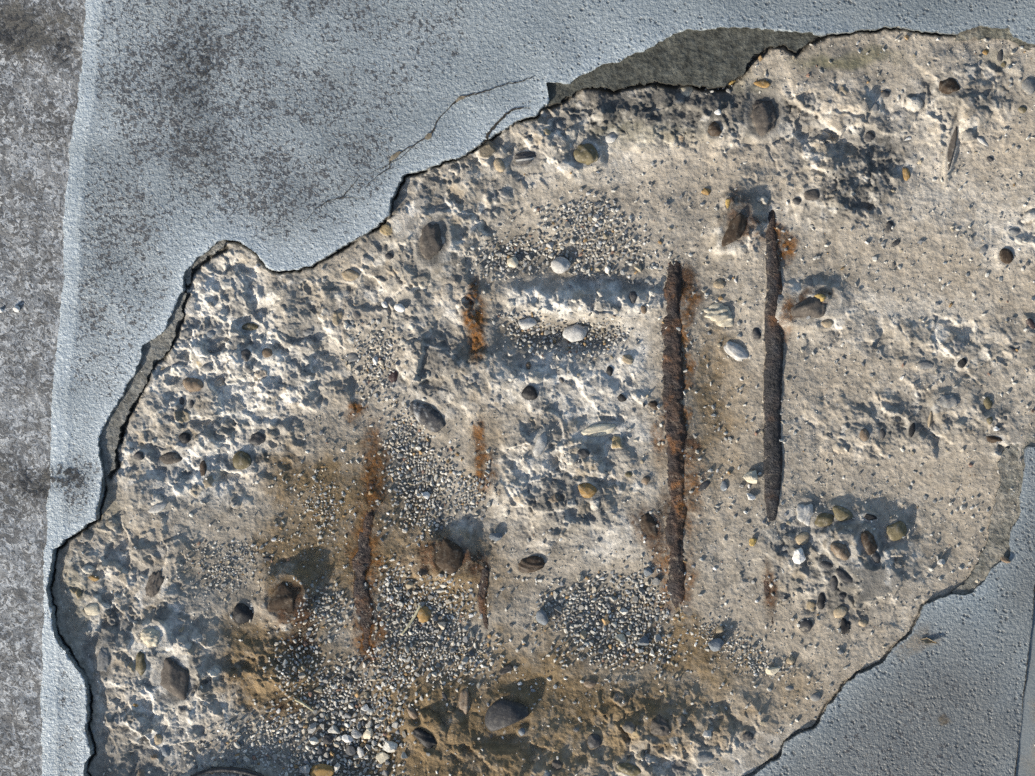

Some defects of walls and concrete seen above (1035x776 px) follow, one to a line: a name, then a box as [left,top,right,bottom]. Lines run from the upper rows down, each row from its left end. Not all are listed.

crack [304,76,535,223]
spalling [547,27,818,105]
spalling [750,100,777,136]
spalling [99,292,188,477]
spalling [410,402,445,432]
corrosion [463,282,484,358]
spalling [661,261,688,610]
spalling [763,210,784,521]
corrosion [226,431,397,719]
corrosion [407,532,486,609]
spalling [952,427,1035,595]
spalling [160,658,189,700]